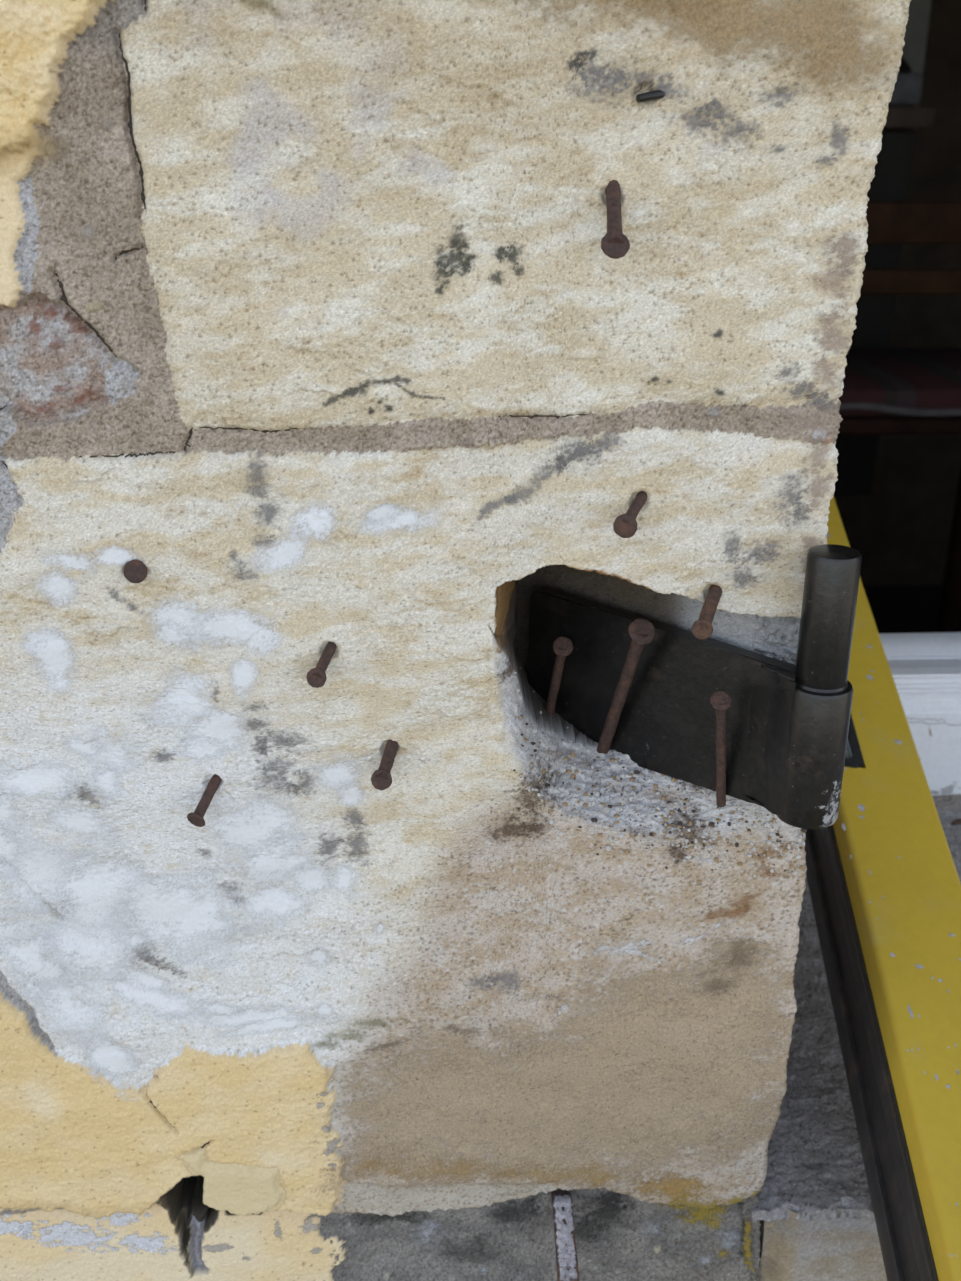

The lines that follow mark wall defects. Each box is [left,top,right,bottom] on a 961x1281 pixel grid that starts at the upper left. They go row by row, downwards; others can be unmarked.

damp [550,0,886,85]
spalling [255,506,337,573]
spalling [37,546,136,606]
spalling [24,630,76,692]
spalling [147,600,286,759]
spalling [0,726,366,1077]
peeling [322,1125,341,1169]
peeling [0,1207,176,1255]